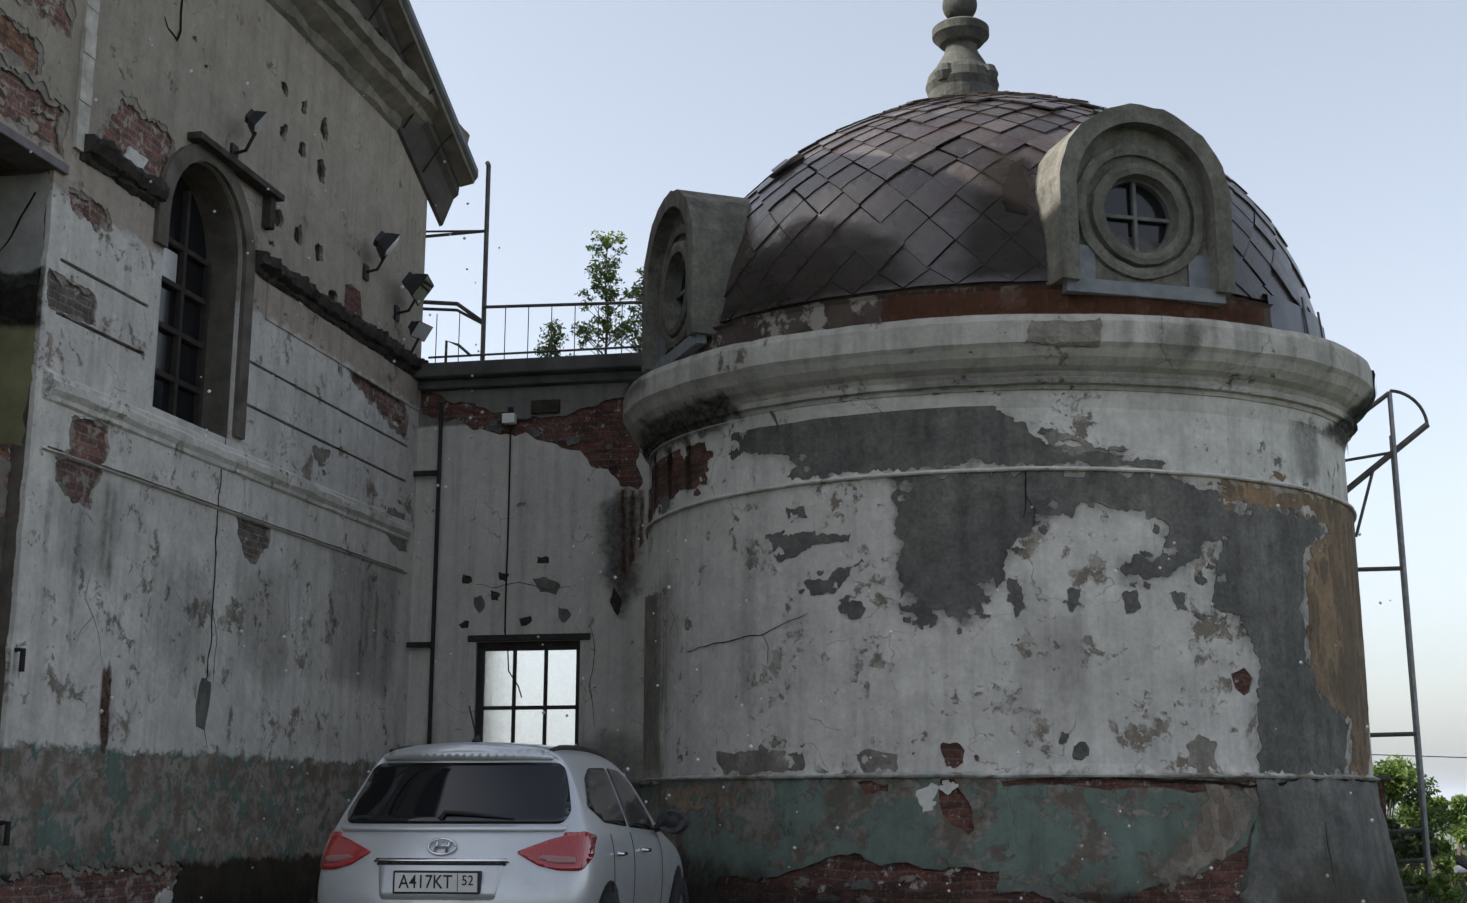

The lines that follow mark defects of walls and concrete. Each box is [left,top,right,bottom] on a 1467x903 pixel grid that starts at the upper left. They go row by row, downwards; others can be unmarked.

flaking render [0,0,75,158]
flaking render [55,415,108,510]
flaking render [338,367,714,521]
flaking render [459,572,509,629]
flaking render [533,556,571,622]
crack [670,610,806,663]
flaking render [1207,471,1370,776]
flaking render [916,742,979,835]
flaking render [1001,732,1259,903]
flaking render [0,861,182,903]
flaking render [718,853,1065,903]